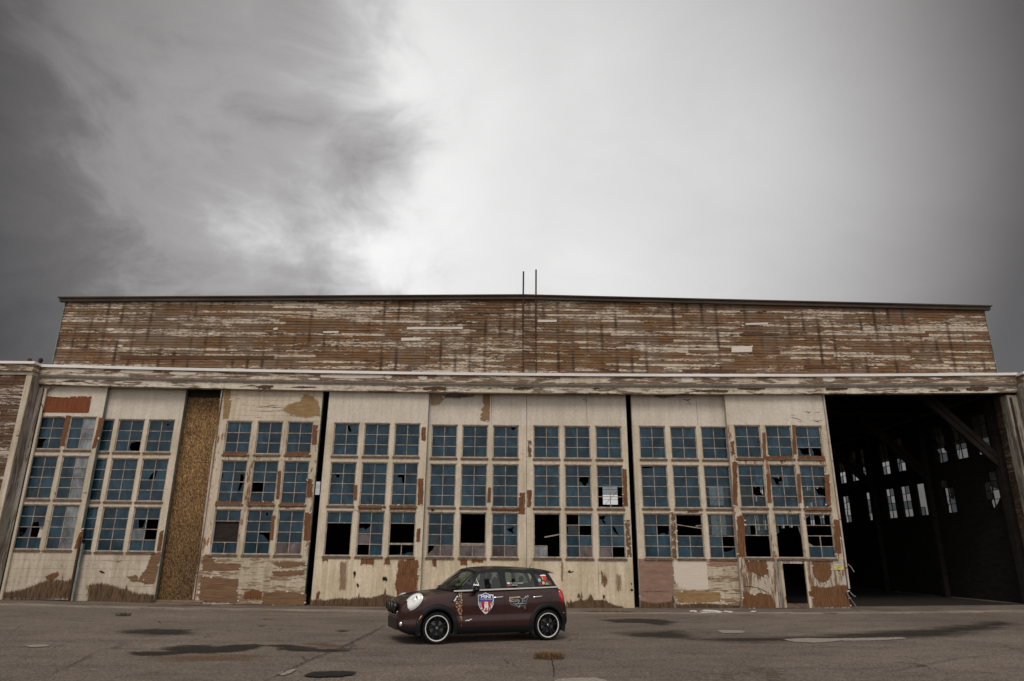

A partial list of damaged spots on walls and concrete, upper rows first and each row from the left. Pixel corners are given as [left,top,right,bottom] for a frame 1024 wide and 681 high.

peeling [681,377,766,393]
peeling [257,385,321,458]
peeling [199,553,240,604]
peeling [261,591,307,606]
peeling [271,561,307,576]
peeling [384,559,420,596]
peeling [673,575,722,604]
peeling [742,589,776,609]